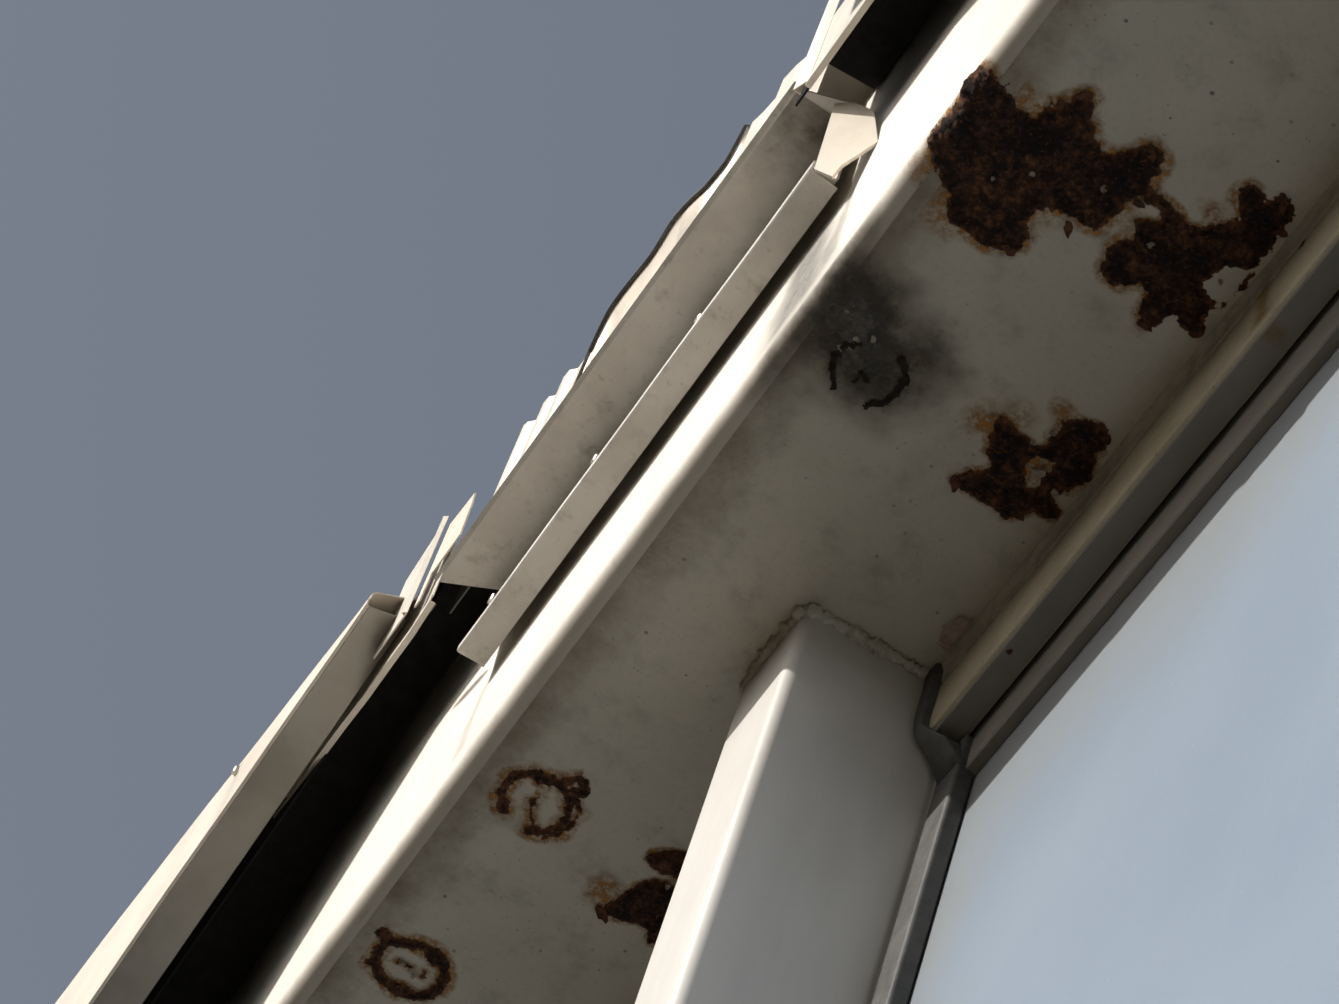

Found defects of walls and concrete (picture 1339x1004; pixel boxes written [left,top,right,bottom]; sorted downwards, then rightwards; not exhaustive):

rust [916,59,1306,338]
leakage [779,229,824,326]
rust [949,404,1111,522]
rust [489,766,591,843]
rust [586,847,687,946]
rust [359,927,456,1003]